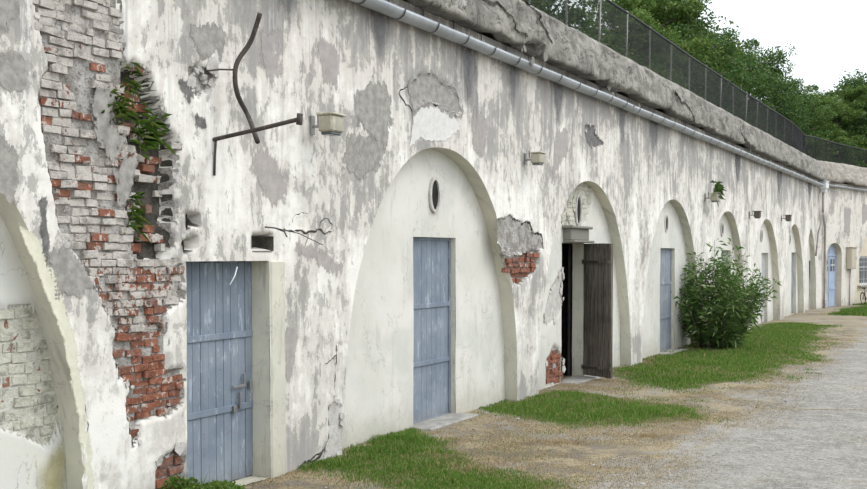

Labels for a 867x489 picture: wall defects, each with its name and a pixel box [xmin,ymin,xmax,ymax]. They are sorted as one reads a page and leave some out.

crack [486,0,553,43]
peeling [179,20,226,105]
spalling [195,113,207,129]
crack [399,69,462,114]
spalling [408,69,487,158]
crack [675,91,695,121]
flaking render [0,0,197,489]
crack [284,218,333,246]
spalling [496,215,543,294]
flaking render [545,346,566,385]